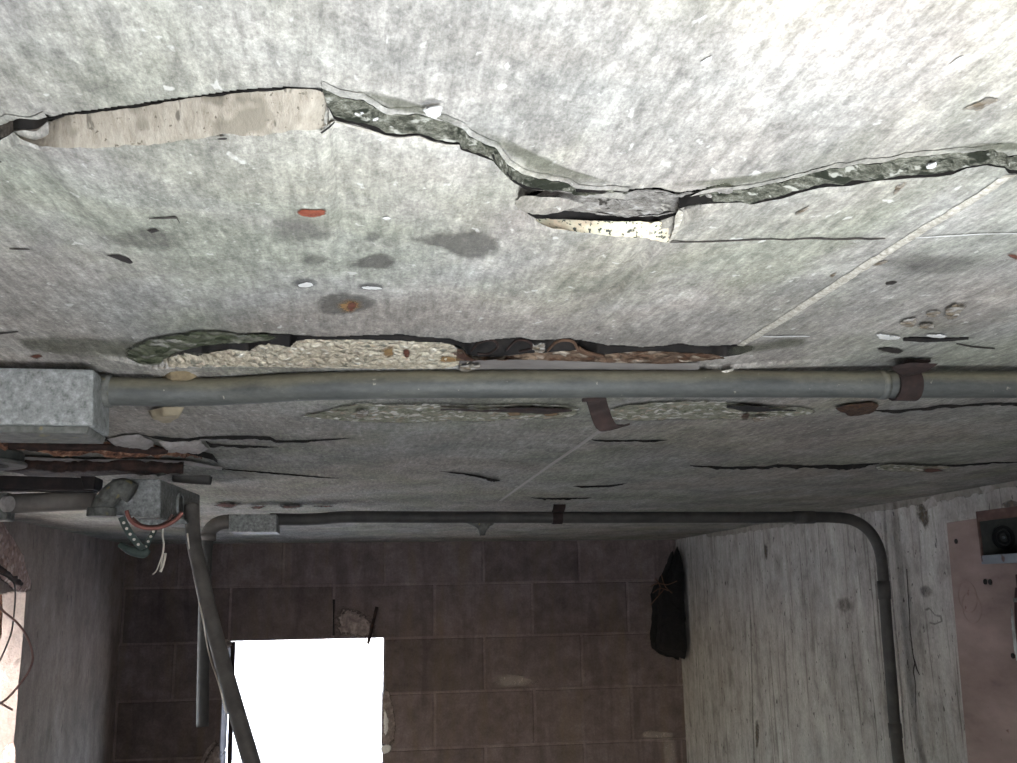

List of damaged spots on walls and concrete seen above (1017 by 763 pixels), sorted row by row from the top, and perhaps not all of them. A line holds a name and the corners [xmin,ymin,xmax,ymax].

spalling [17,89,335,149]
crack [0,81,1017,243]
spalling [535,210,683,242]
spalling [28,331,810,372]
spalling [303,402,579,423]
spalling [610,400,814,422]
crack [860,402,1017,418]
crack [142,435,351,480]
crack [439,471,500,482]
crack [684,462,879,470]
crack [947,460,1017,468]